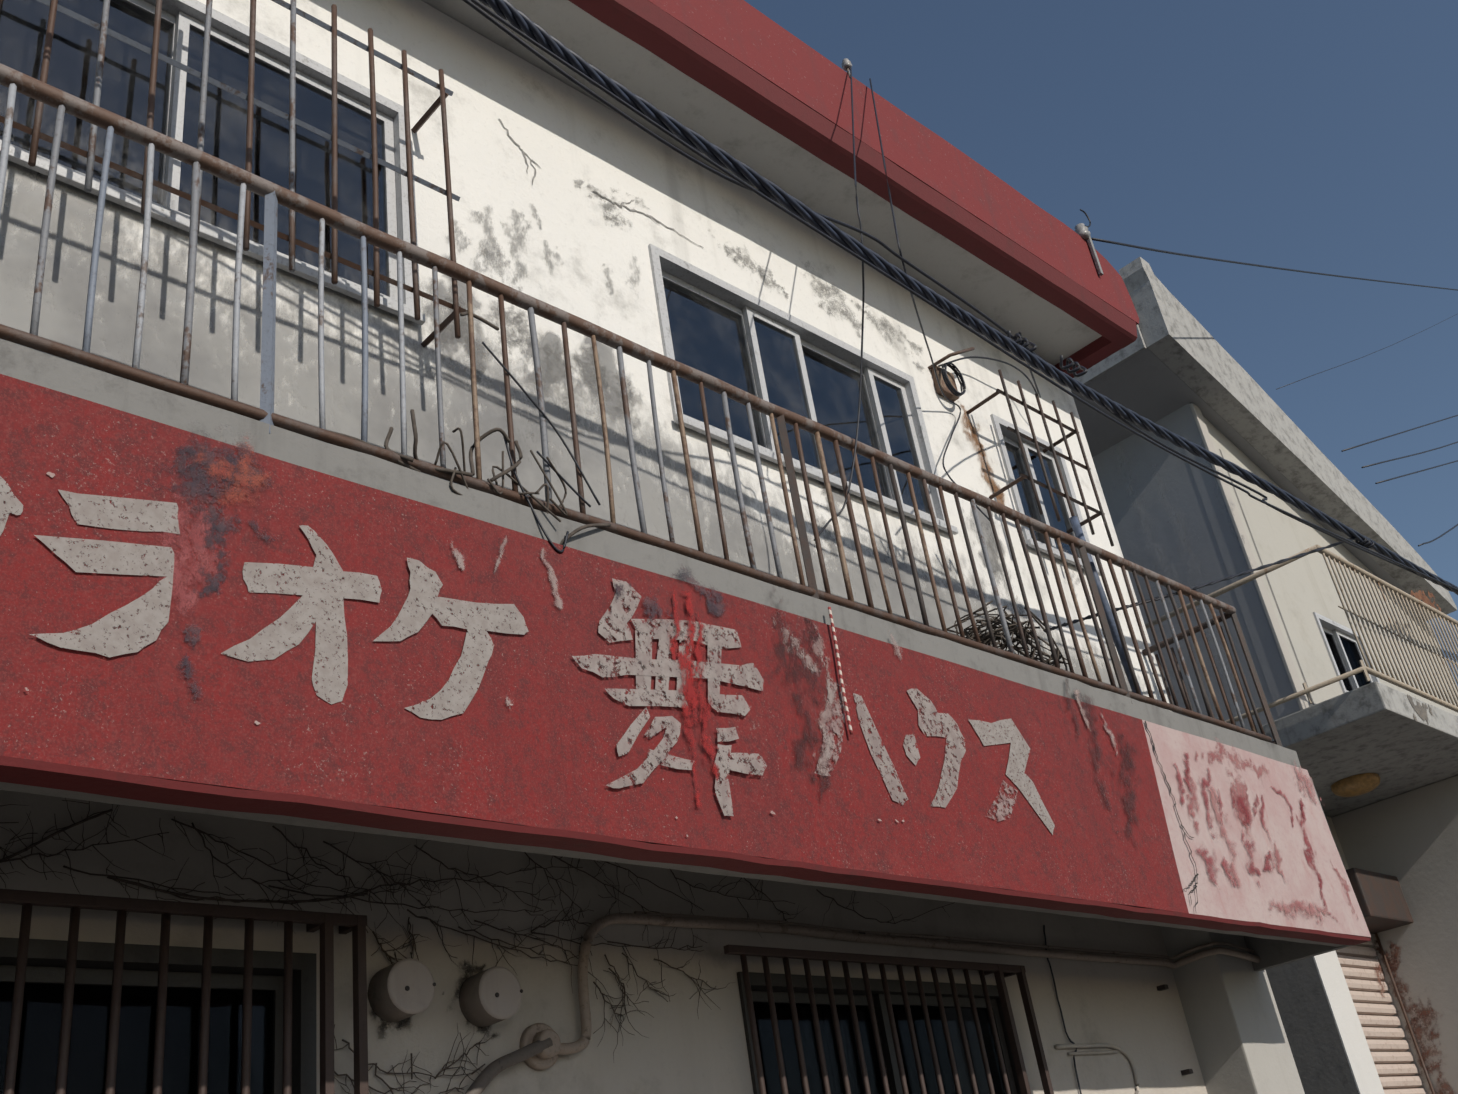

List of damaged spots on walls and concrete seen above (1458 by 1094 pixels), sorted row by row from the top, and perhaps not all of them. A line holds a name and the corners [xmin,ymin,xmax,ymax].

crack [499,119,541,185]
crack [593,191,704,248]
corrosion [961,405,1004,505]